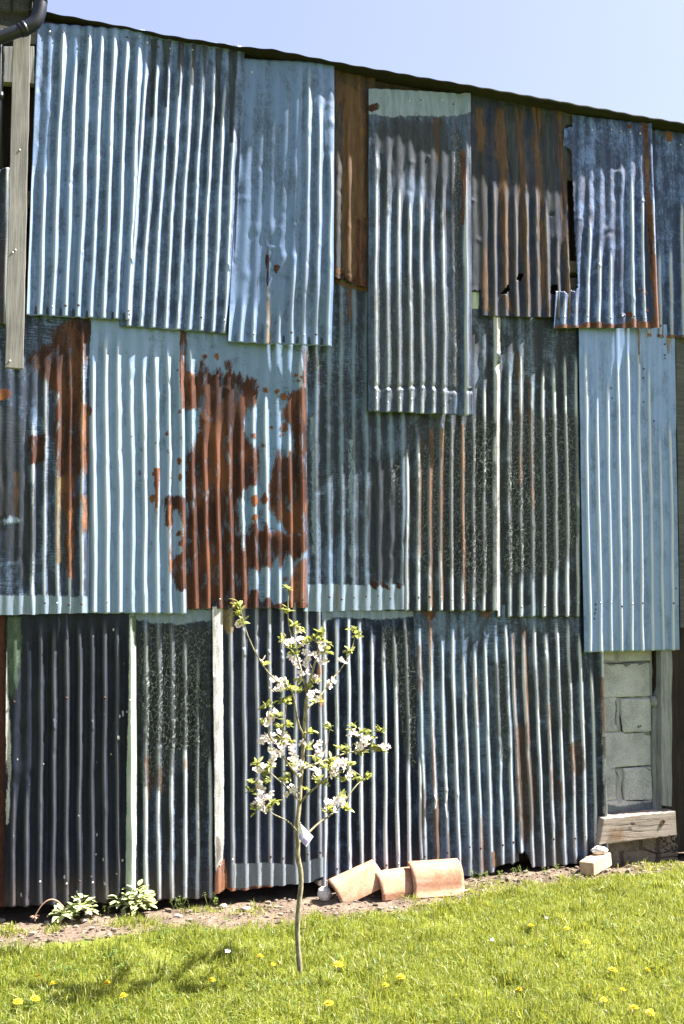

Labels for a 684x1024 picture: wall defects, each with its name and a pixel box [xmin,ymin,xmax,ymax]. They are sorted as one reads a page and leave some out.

corrosion [334,82,379,322]
corrosion [460,105,571,314]
corrosion [555,122,684,338]
corrosion [27,317,92,578]
corrosion [138,330,308,609]